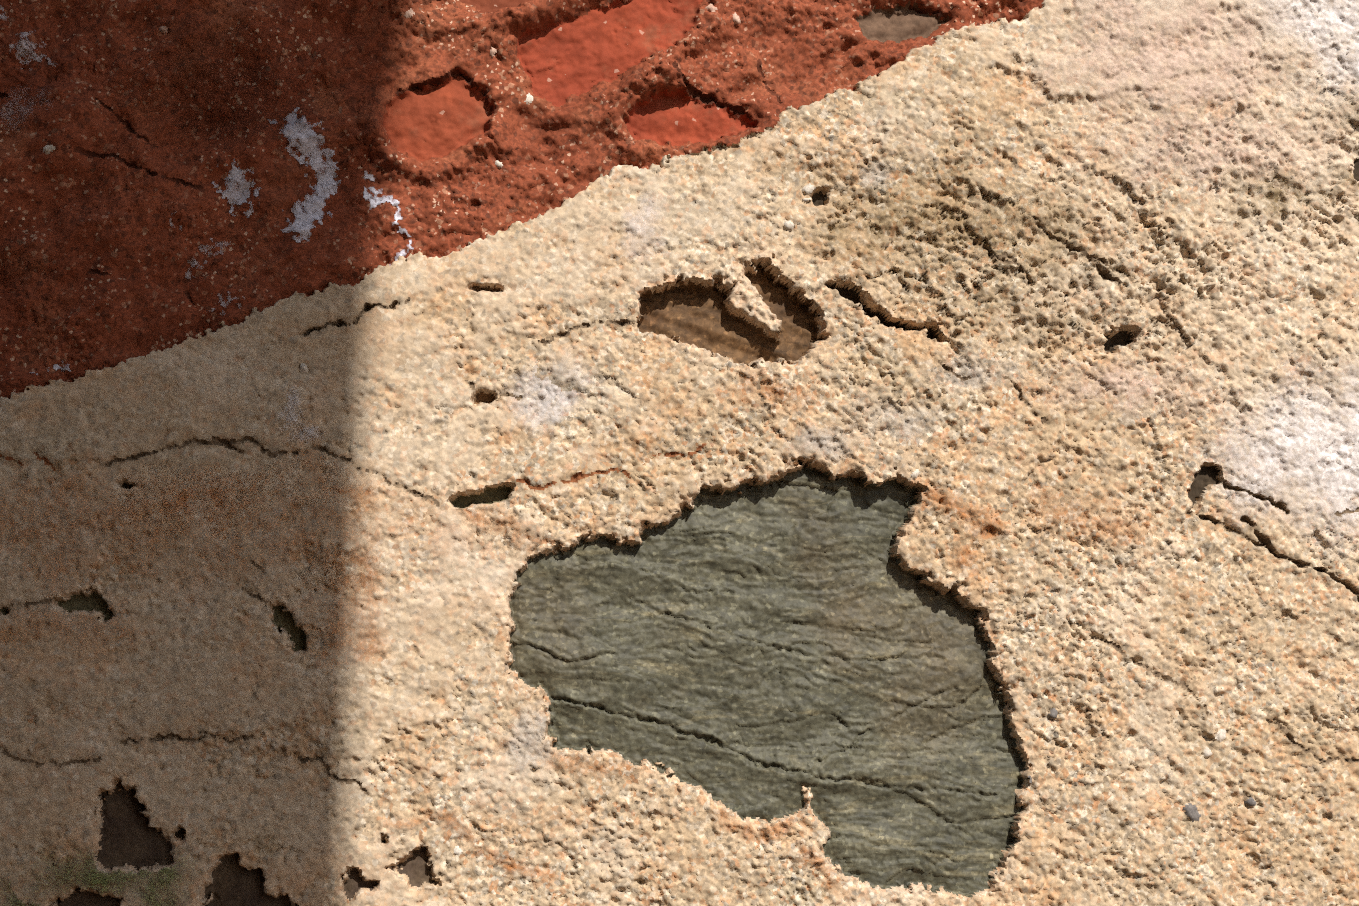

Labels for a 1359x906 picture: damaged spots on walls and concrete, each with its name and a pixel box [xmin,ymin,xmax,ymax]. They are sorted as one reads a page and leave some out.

spalling [636,253,831,369]
spalling [823,279,946,342]
spalling [1102,324,1143,356]
spalling [469,389,500,406]
crack [0,452,55,471]
crack [105,436,440,507]
spalling [444,482,516,509]
spalling [1186,461,1227,512]
crack [1187,481,1359,602]
spalling [504,456,1033,899]
spalling [90,776,186,875]
spalling [198,852,299,906]